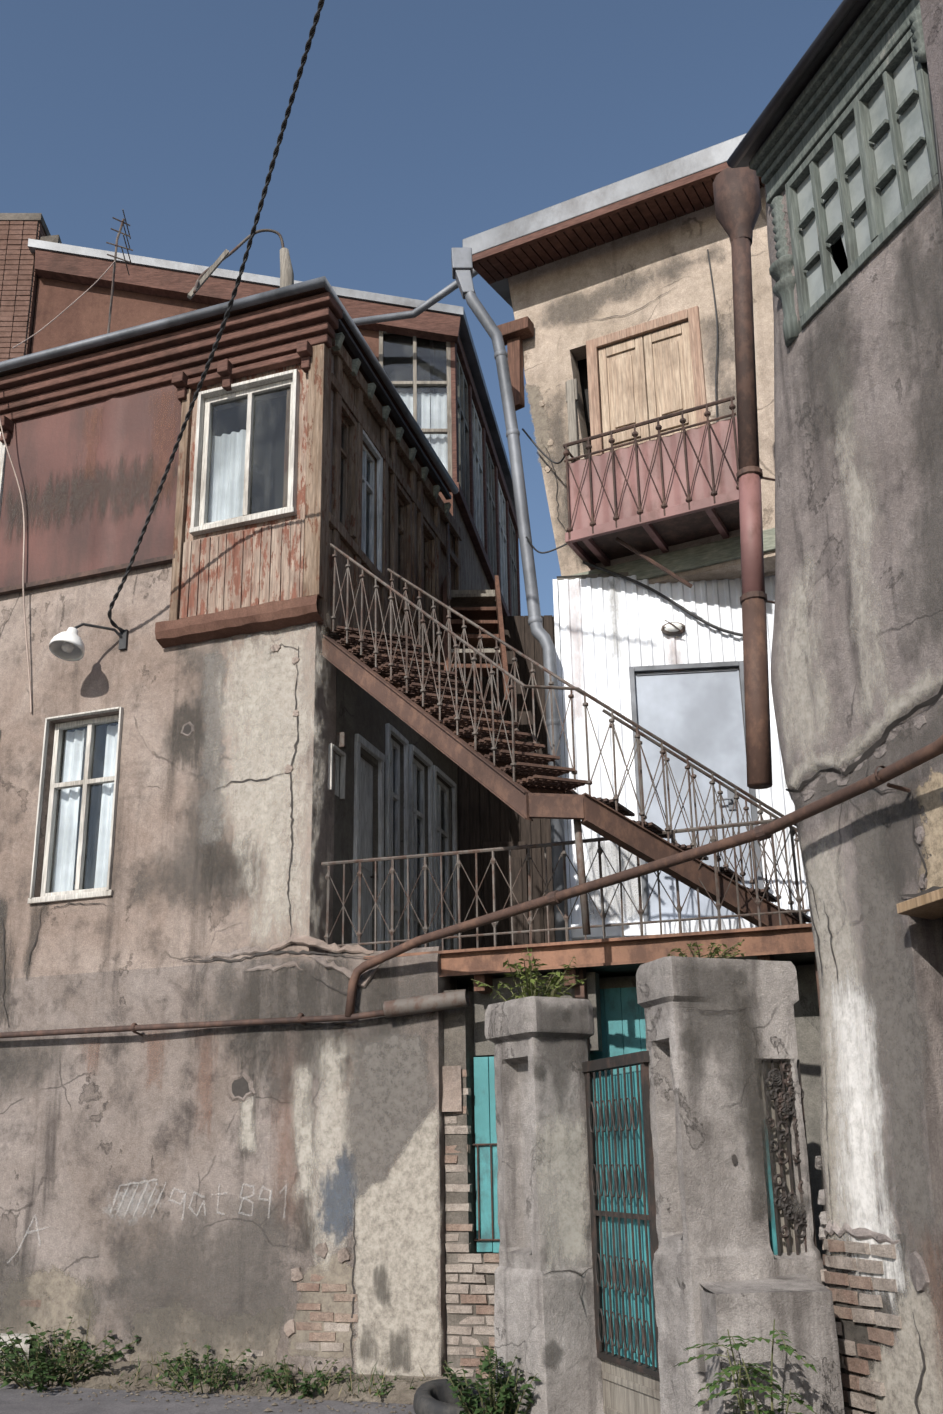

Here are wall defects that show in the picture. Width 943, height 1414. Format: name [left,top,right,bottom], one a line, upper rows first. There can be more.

water stain [550,277,645,321]
water stain [138,653,283,925]
crack [180,643,371,1013]
peeling [914,769,943,890]
peeling [243,934,380,988]
water stain [220,963,430,1261]
flaking render [129,1242,358,1368]
flaking render [815,1147,930,1414]
crack [912,1312,925,1414]